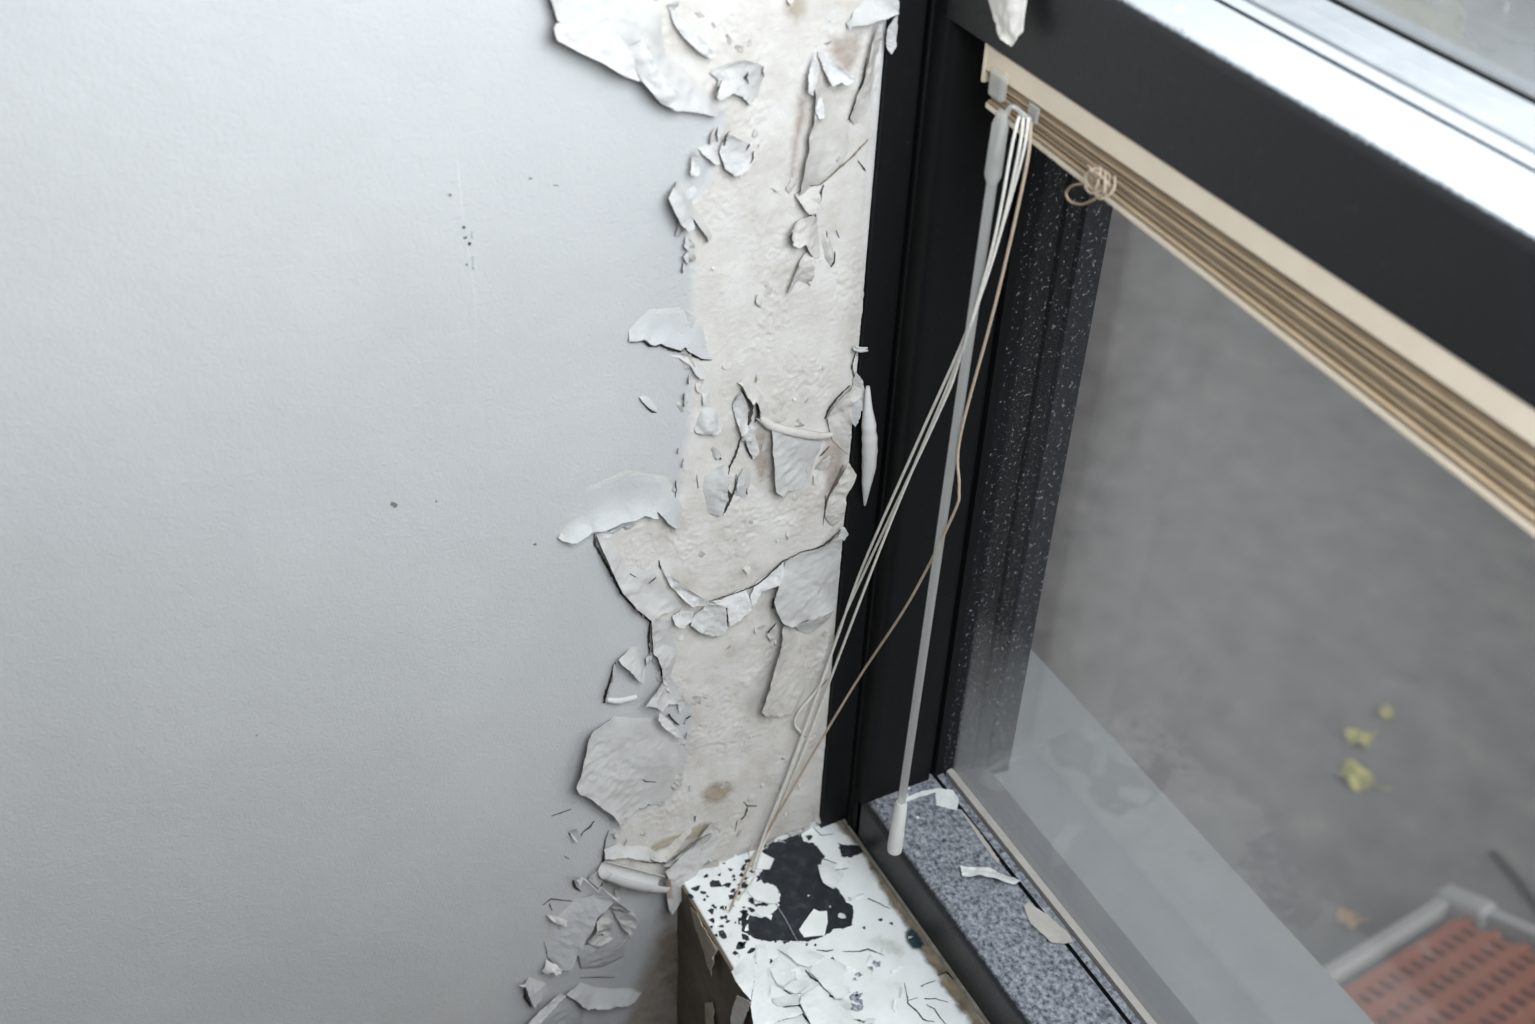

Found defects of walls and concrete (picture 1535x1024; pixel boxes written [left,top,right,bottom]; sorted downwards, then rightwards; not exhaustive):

flaking render [519,0,903,1024]
peeling [989,0,1027,46]